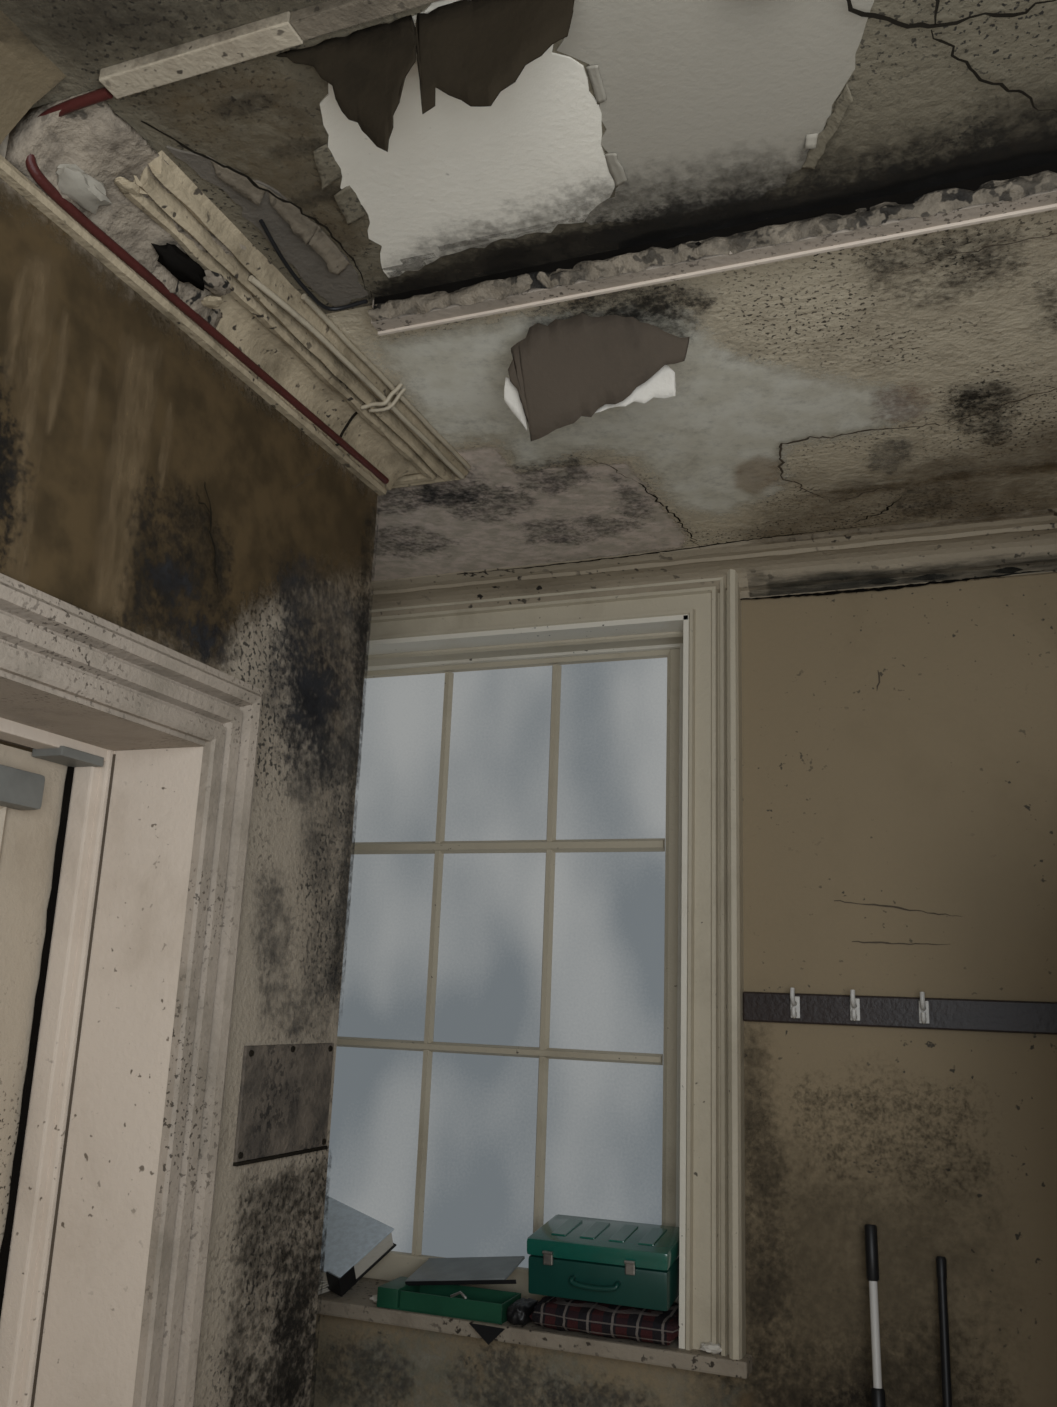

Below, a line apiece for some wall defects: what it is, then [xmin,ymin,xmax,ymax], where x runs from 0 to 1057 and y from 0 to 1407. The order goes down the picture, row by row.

crack [846,0,1057,112]
spalling [151,243,231,308]
peeling [167,0,1057,321]
water stain [547,287,715,337]
peeling [383,309,922,515]
water stain [375,105,1057,307]
water stain [945,383,1020,445]
water stain [0,182,686,1035]
water stain [750,556,1057,597]
water stain [226,1156,408,1407]